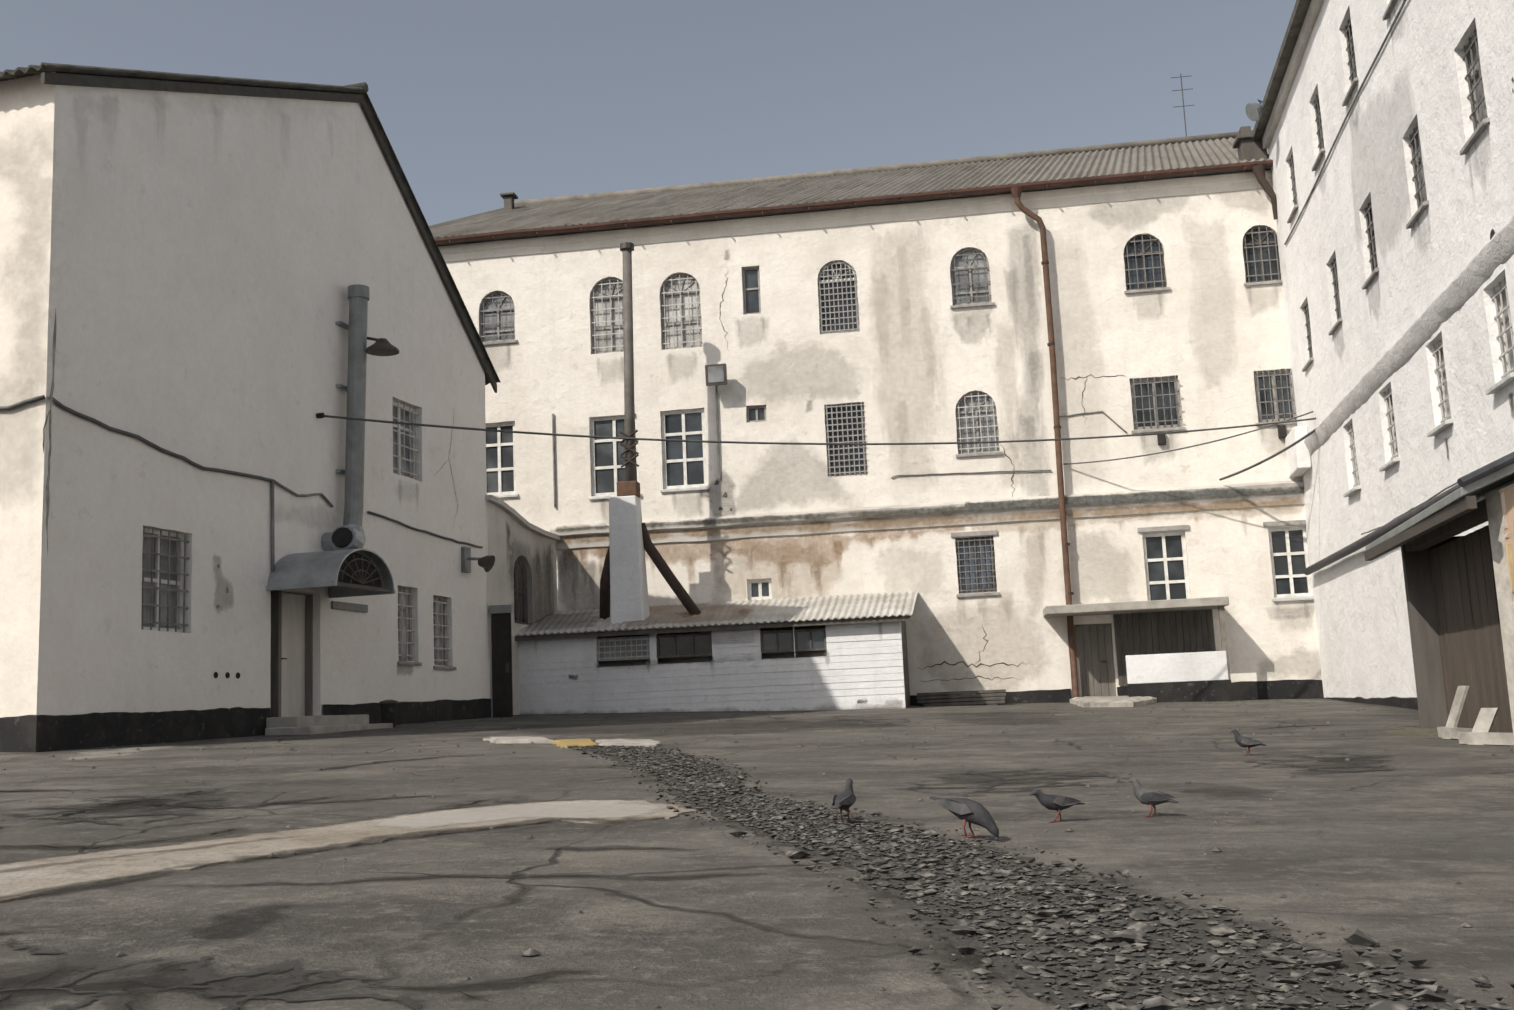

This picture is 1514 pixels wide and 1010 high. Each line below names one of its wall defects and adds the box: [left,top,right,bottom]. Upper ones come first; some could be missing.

crack [919,625,1025,682]